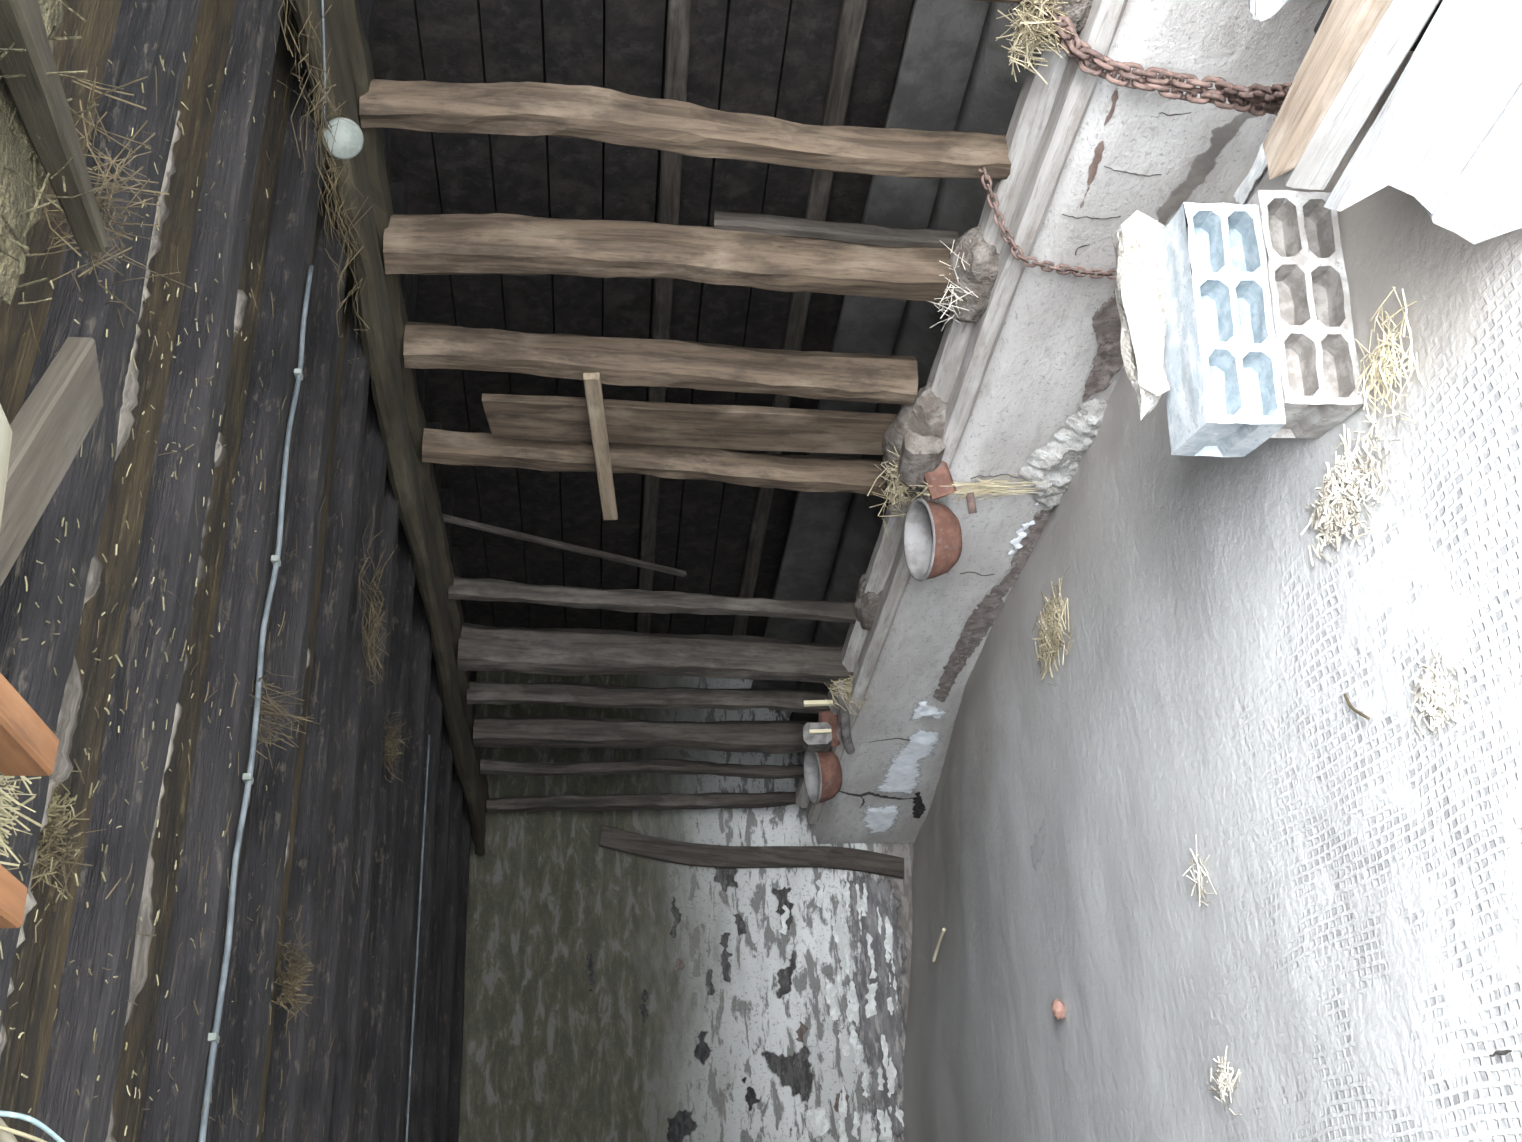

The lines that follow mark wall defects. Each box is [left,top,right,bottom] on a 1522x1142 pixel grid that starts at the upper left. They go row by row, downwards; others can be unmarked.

spalling [933,510,1052,703]
spalling [913,792,926,819]
flaking render [714,868,738,892]
flaking render [670,896,684,971]
flaking render [706,914,746,995]
peeling [761,870,907,1142]
flaking render [694,1031,712,1065]
flaking render [742,1077,760,1111]
flaking render [667,1110,697,1142]